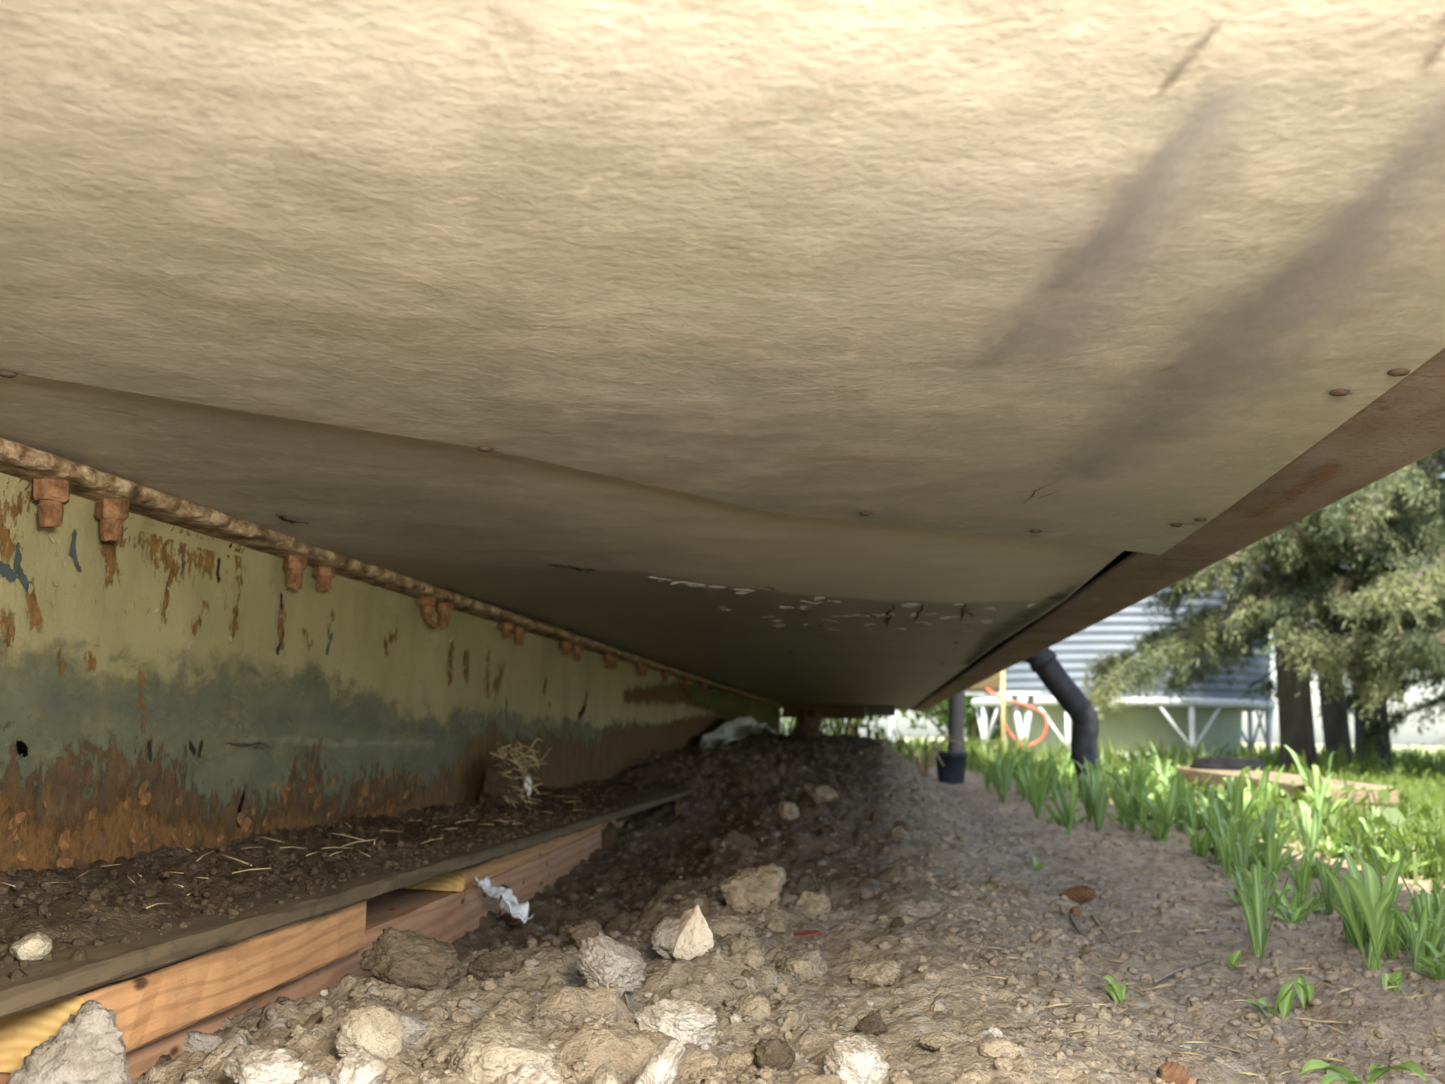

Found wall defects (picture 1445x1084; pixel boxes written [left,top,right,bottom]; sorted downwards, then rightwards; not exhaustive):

peeling [0,543,32,592]
corrosion [0,479,34,563]
corrosion [0,579,42,646]
peeling [69,529,82,572]
corrosion [102,518,215,623]
corrosion [230,544,243,639]
corrosion [277,603,286,655]
peeling [647,577,755,611]
peeling [762,597,997,632]
corrosion [0,669,752,873]